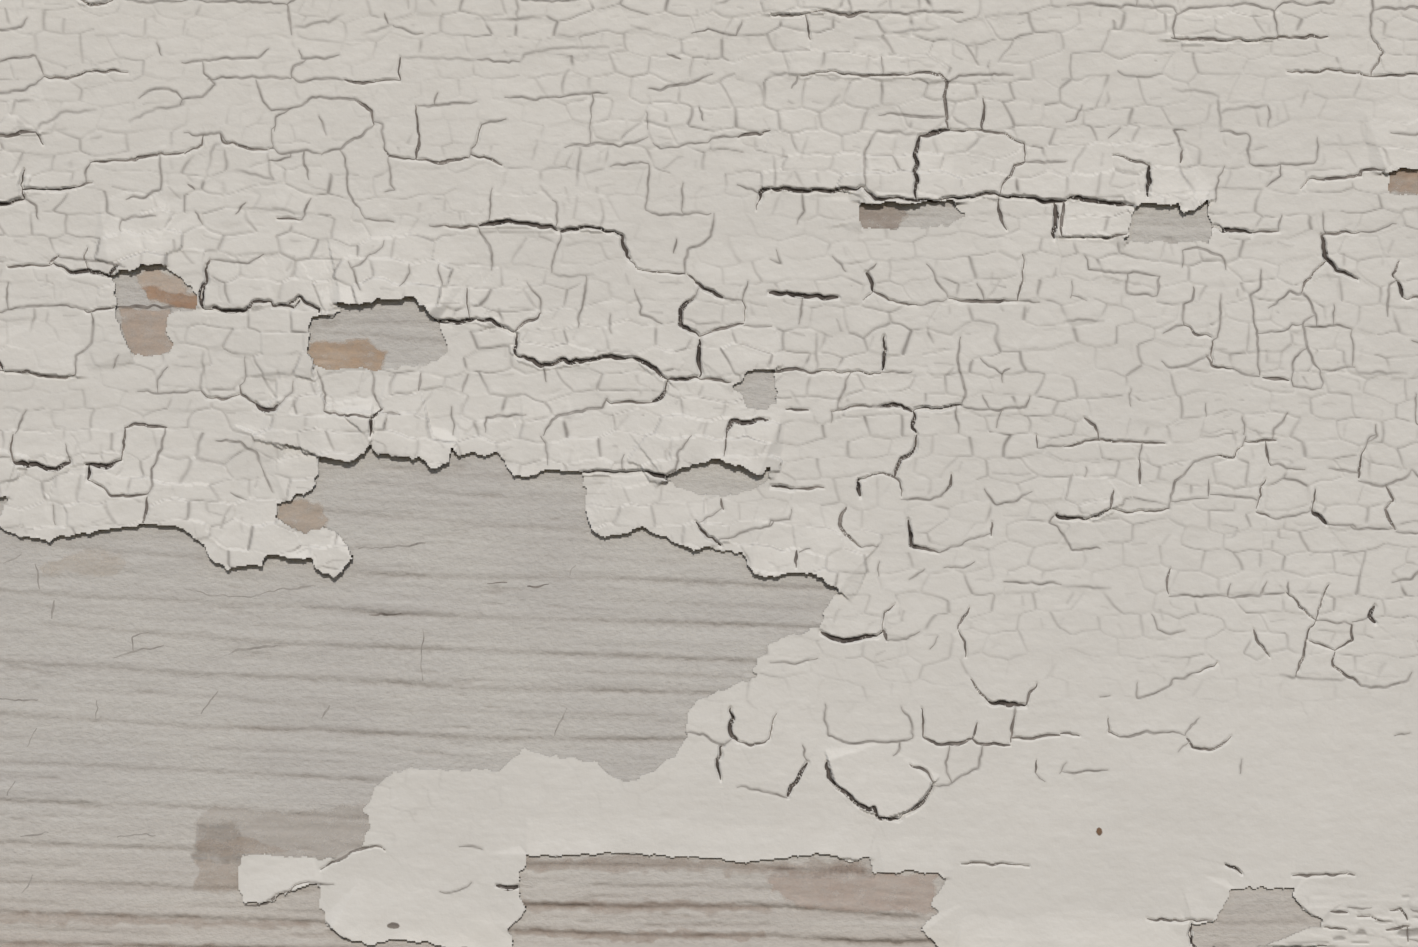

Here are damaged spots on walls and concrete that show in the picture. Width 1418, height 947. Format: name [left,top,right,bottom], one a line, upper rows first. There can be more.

peeling [860,199,965,230]
peeling [1124,200,1222,244]
peeling [1388,168,1418,195]
peeling [111,264,203,356]
peeling [307,296,448,371]
crack [0,0,1418,580]
crack [487,565,576,588]
crack [1004,579,1062,587]
crack [369,613,424,681]
peeling [0,411,1323,947]
crack [686,605,1242,821]
crack [1151,568,1418,689]